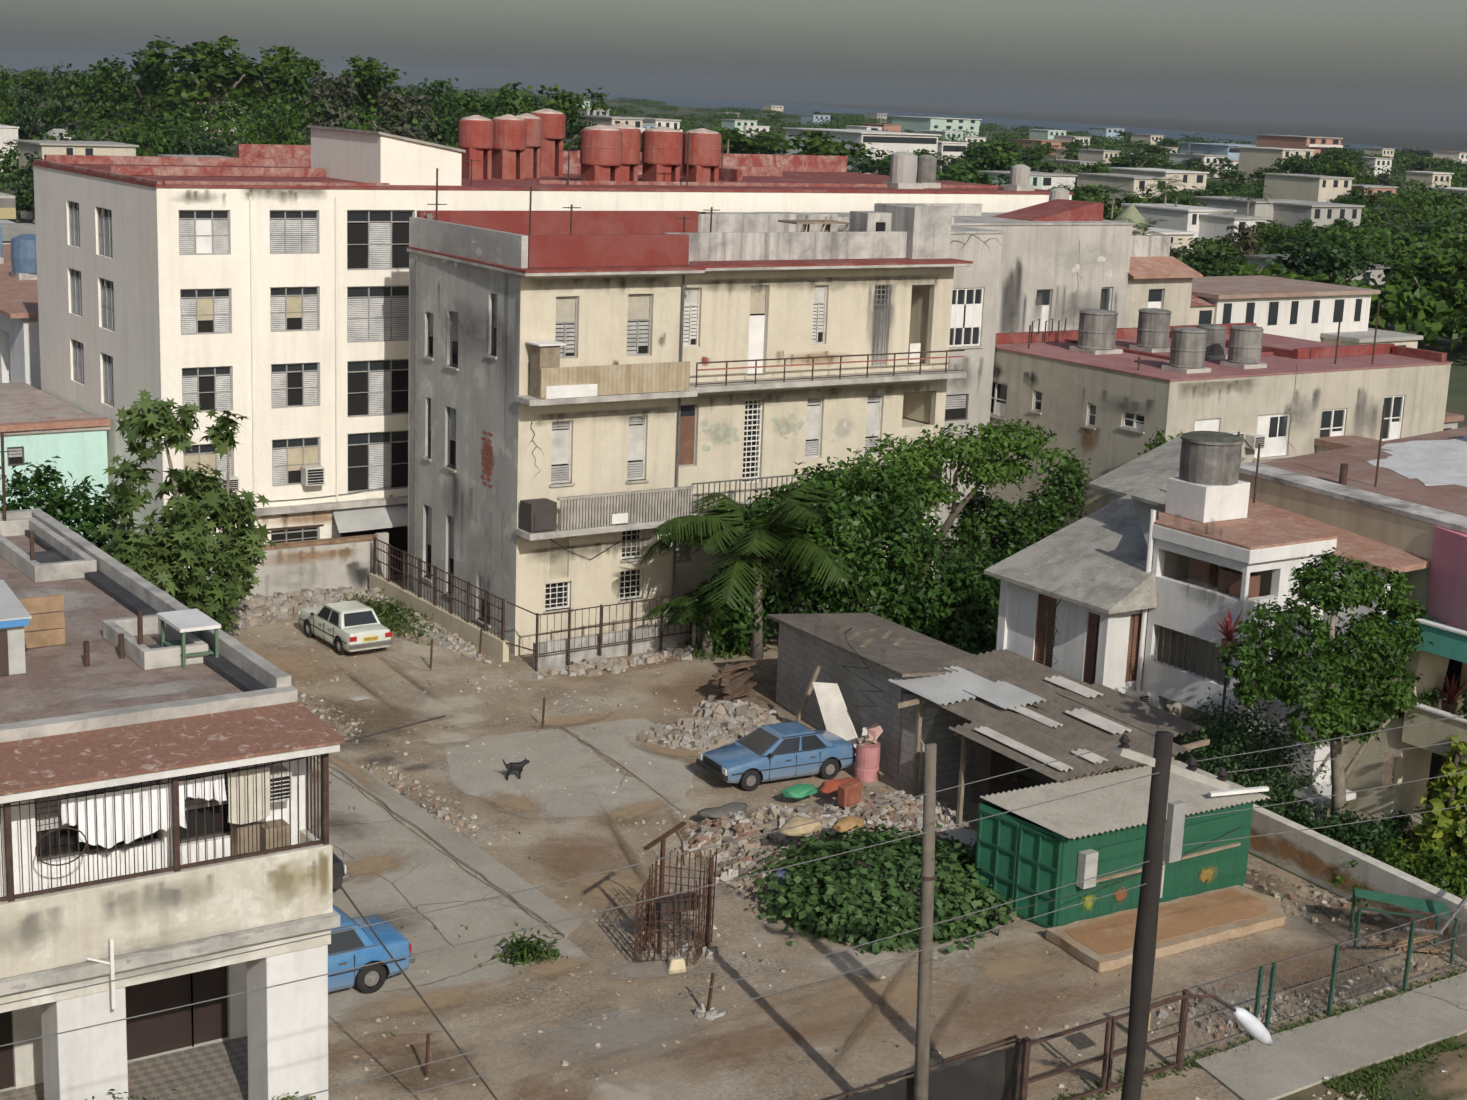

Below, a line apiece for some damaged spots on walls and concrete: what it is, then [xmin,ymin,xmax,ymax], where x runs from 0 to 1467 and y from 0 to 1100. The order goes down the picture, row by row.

water stain [1003,262,1026,333]
crack [529,421,543,478]